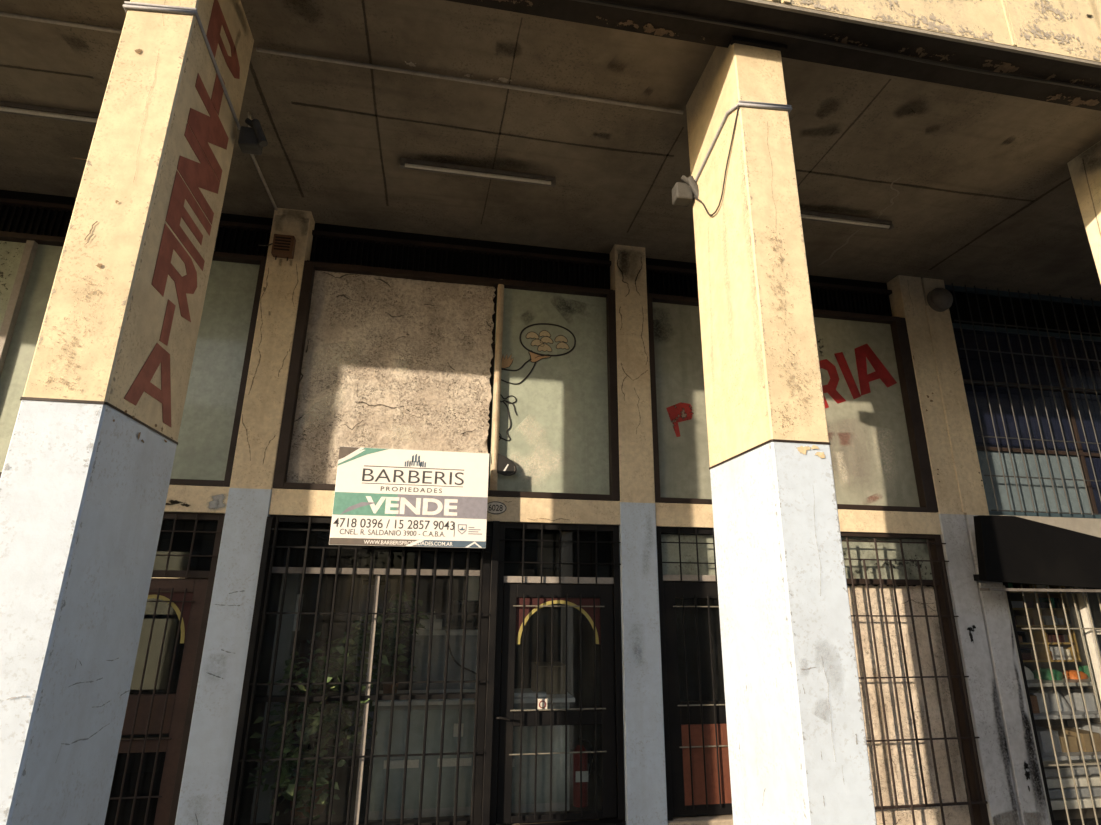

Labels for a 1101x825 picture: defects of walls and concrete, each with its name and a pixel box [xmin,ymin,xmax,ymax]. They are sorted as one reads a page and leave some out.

crack [617,255,648,433]
water stain [993,684,1040,825]
water stain [1015,669,1045,800]